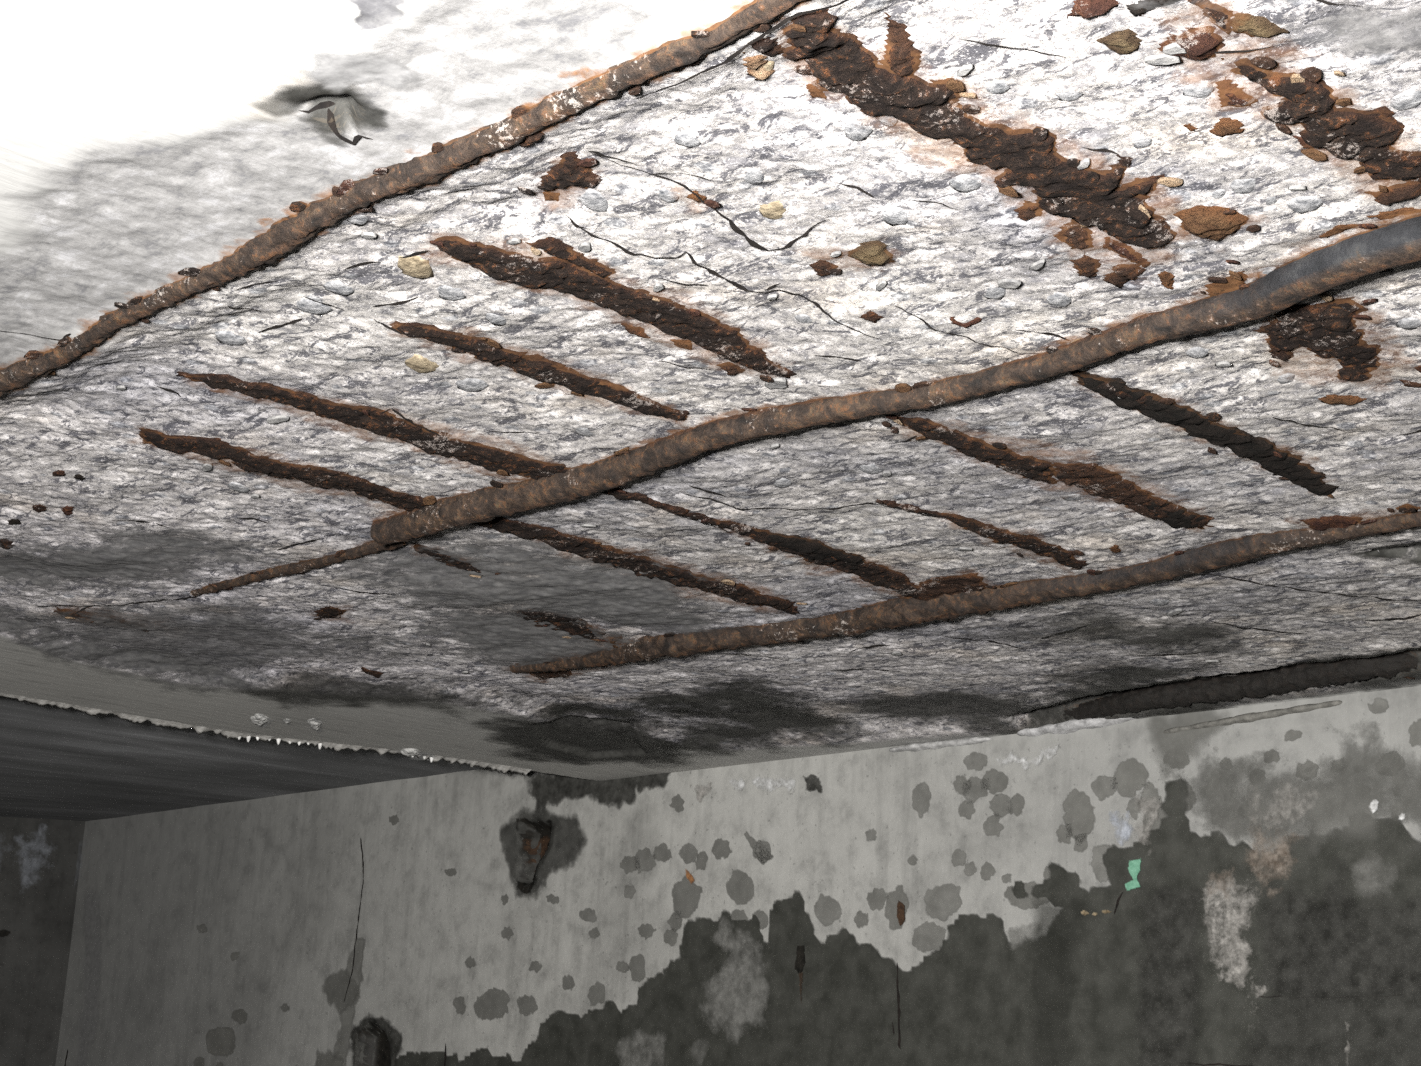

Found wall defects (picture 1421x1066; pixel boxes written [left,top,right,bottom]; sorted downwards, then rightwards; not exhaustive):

rust [742,9,1260,290]
rust [1066,0,1421,256]
rust [176,371,569,488]
rust [389,321,777,456]
rust [430,236,796,383]
spalling [0,0,1421,752]
crack [567,151,879,339]
rust [1070,370,1340,498]
damp [0,527,254,592]
damp [344,537,716,670]
damp [1351,542,1421,565]
damp [0,606,1421,1066]